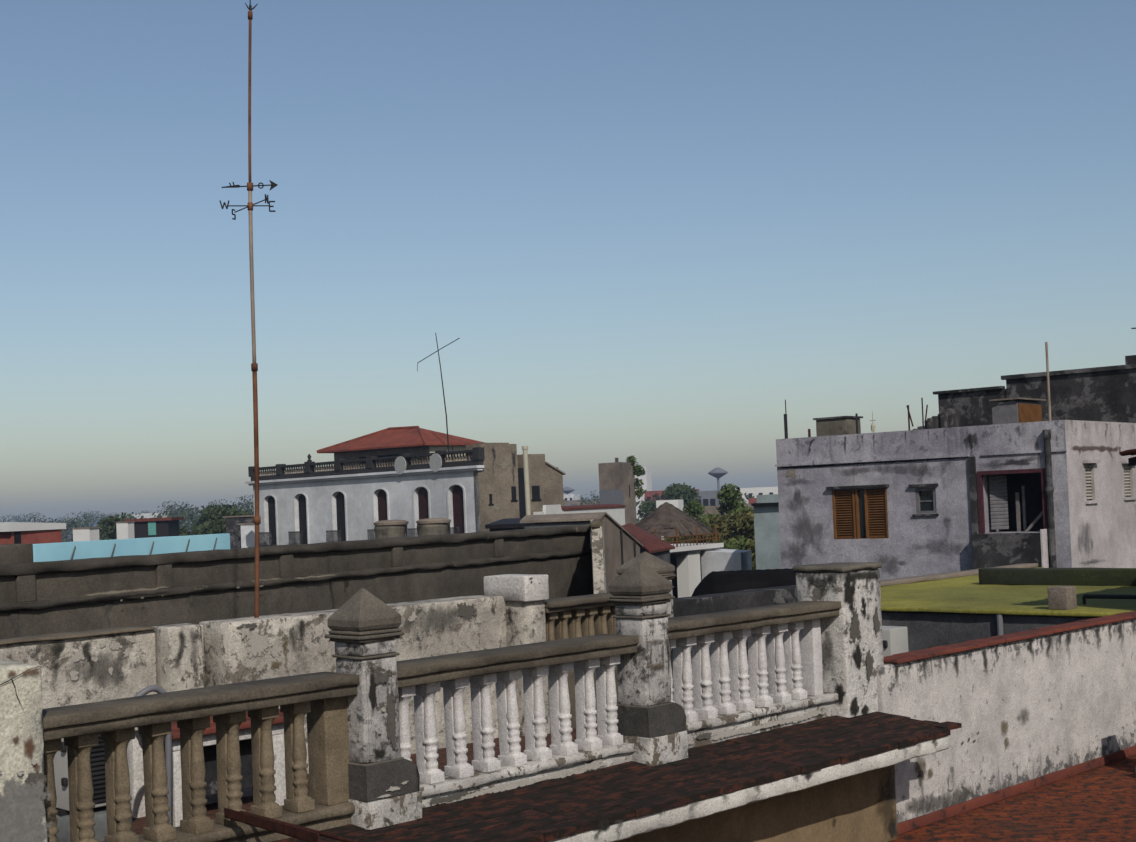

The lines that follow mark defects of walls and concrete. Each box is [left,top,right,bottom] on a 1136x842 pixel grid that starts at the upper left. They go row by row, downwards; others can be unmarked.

damp [990,441,1039,467]
damp [809,558,904,595]
peeling [237,623,282,660]
peeling [822,637,832,662]
peeling [844,571,881,684]
damp [896,647,998,678]
damp [1029,621,1136,656]
peeling [369,670,397,758]
flaking render [0,759,52,842]
damp [880,779,897,837]
damp [909,759,970,811]